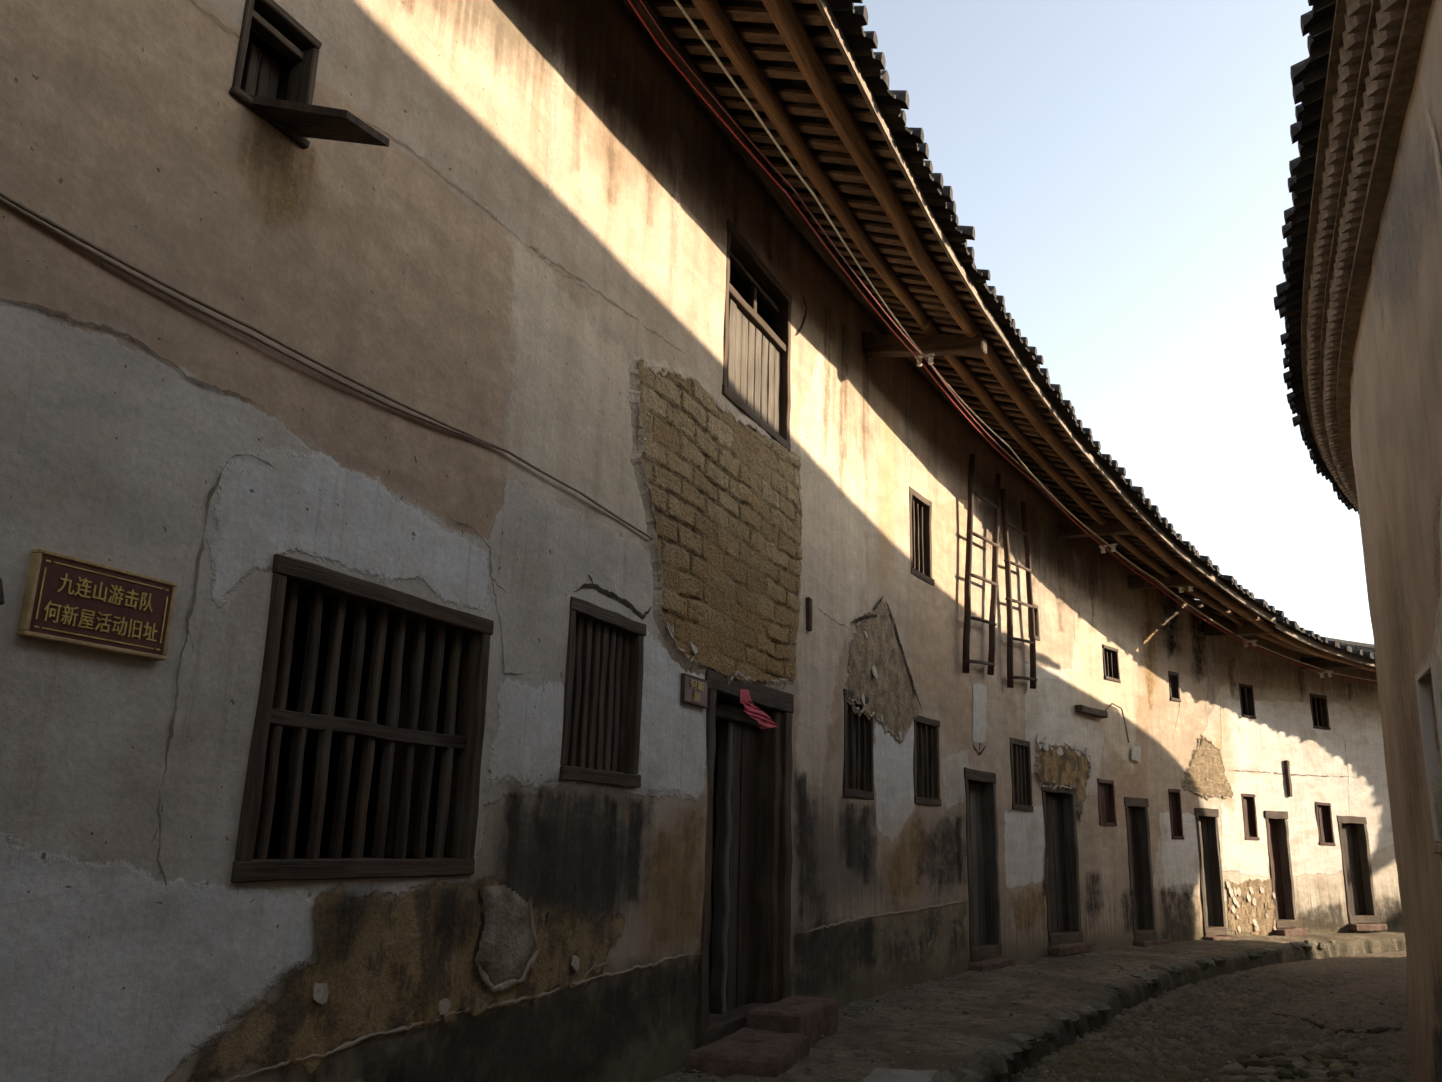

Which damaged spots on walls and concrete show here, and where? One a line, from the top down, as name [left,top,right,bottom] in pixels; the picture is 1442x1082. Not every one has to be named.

flaking render [628,354,803,691]
crack [154,454,272,889]
peeling [845,600,919,744]
peeling [1033,735,1091,822]
peeling [1181,734,1233,801]
leakage [795,774,876,995]
leakage [917,818,966,894]
peeling [1226,879,1276,936]